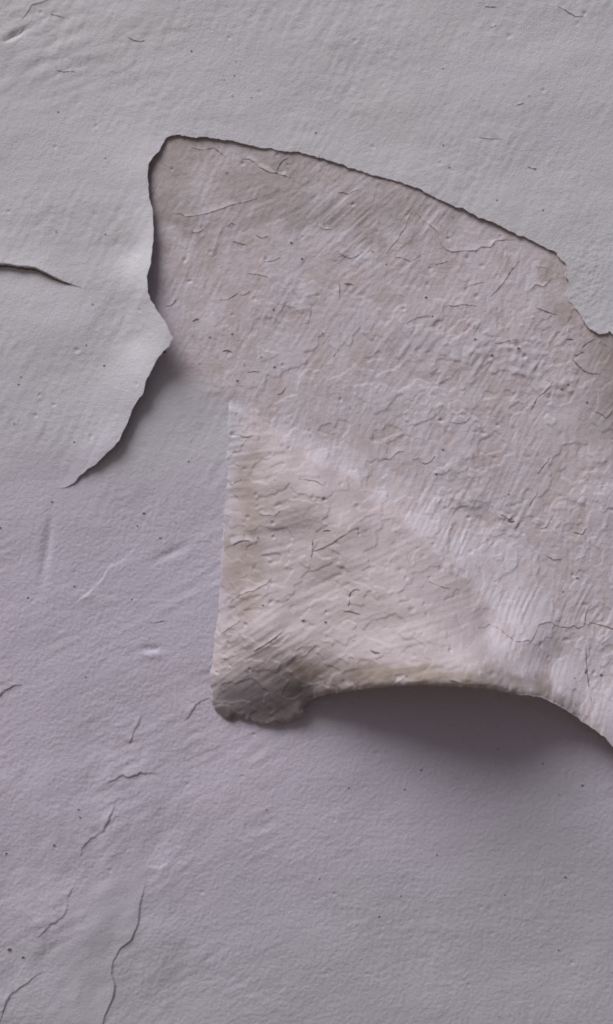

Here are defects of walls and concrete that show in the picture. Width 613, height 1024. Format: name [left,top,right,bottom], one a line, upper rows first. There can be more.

crack [0,265,79,287]
peeling [23,135,613,748]
crack [184,697,208,721]
crack [0,972,41,1021]